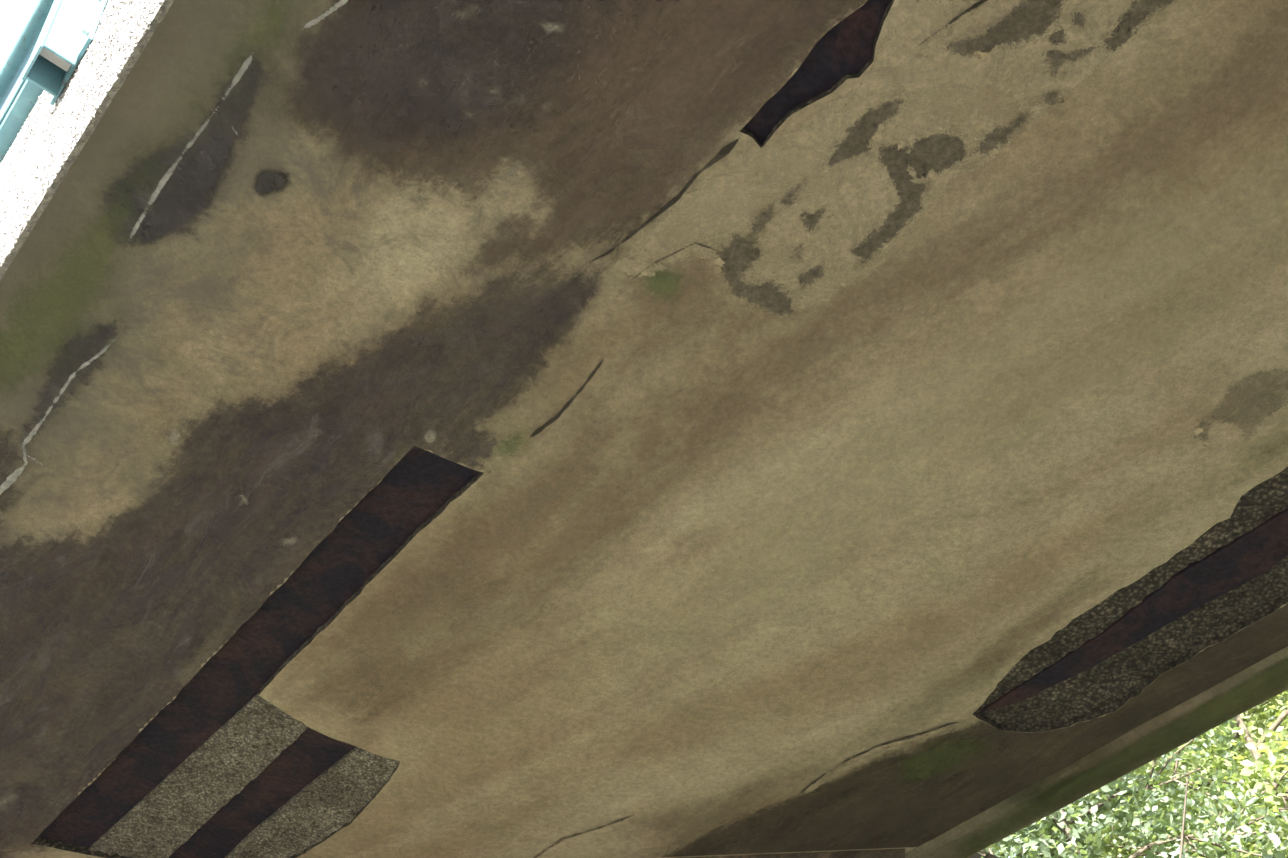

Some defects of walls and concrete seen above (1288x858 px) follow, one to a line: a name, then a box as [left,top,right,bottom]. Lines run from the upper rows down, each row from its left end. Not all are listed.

crack [129,55,253,240]
crack [590,137,740,262]
crack [635,242,712,278]
peeling [610,0,1173,316]
crack [0,332,122,495]
water stain [0,0,866,858]
crack [530,355,607,438]
spalling [37,448,480,858]
spalling [975,467,1288,727]